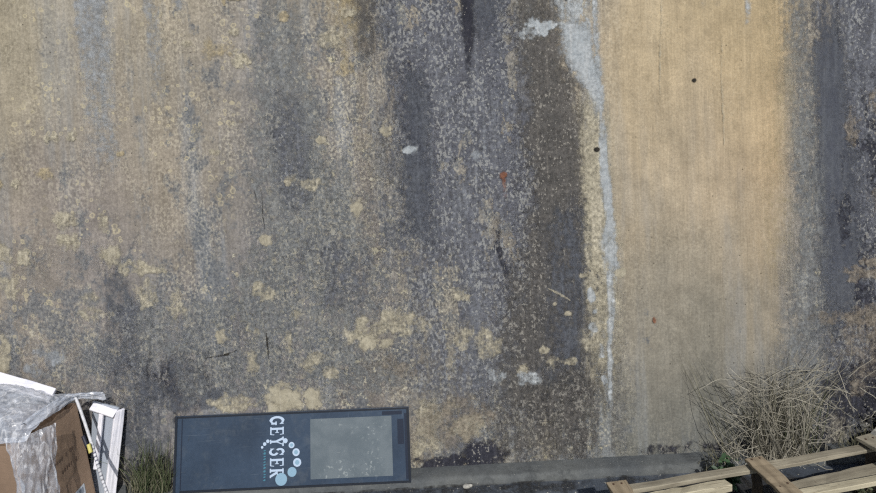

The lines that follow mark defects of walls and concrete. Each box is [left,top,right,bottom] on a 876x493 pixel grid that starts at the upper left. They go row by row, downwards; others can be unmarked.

damp [353,0,626,468]
damp [703,439,764,451]
damp [770,0,876,445]